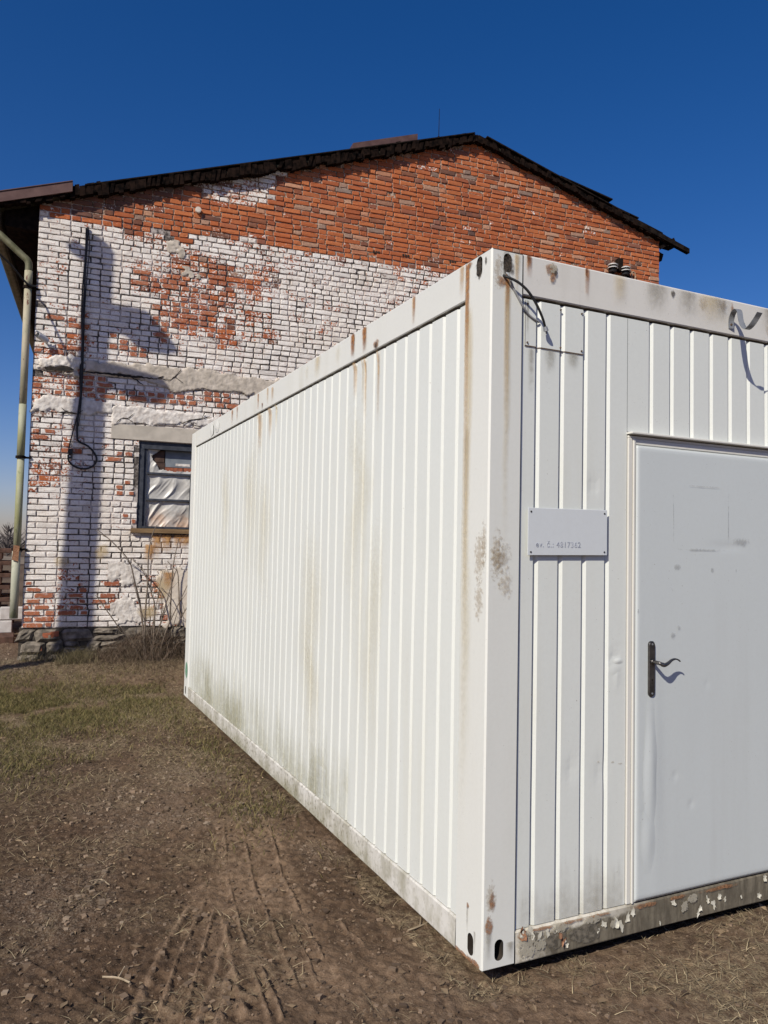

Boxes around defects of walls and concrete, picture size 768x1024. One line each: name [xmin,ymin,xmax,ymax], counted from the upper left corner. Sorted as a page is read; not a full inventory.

rust [546,264,557,282]
peeling [133,240,226,343]
rust [500,255,532,343]
peeling [47,314,87,329]
peeling [109,333,147,357]
crack [83,370,183,385]
spalling [33,344,238,409]
peeling [32,429,55,439]
spalling [23,559,188,628]
peeling [671,894,726,918]
peeling [518,907,635,960]